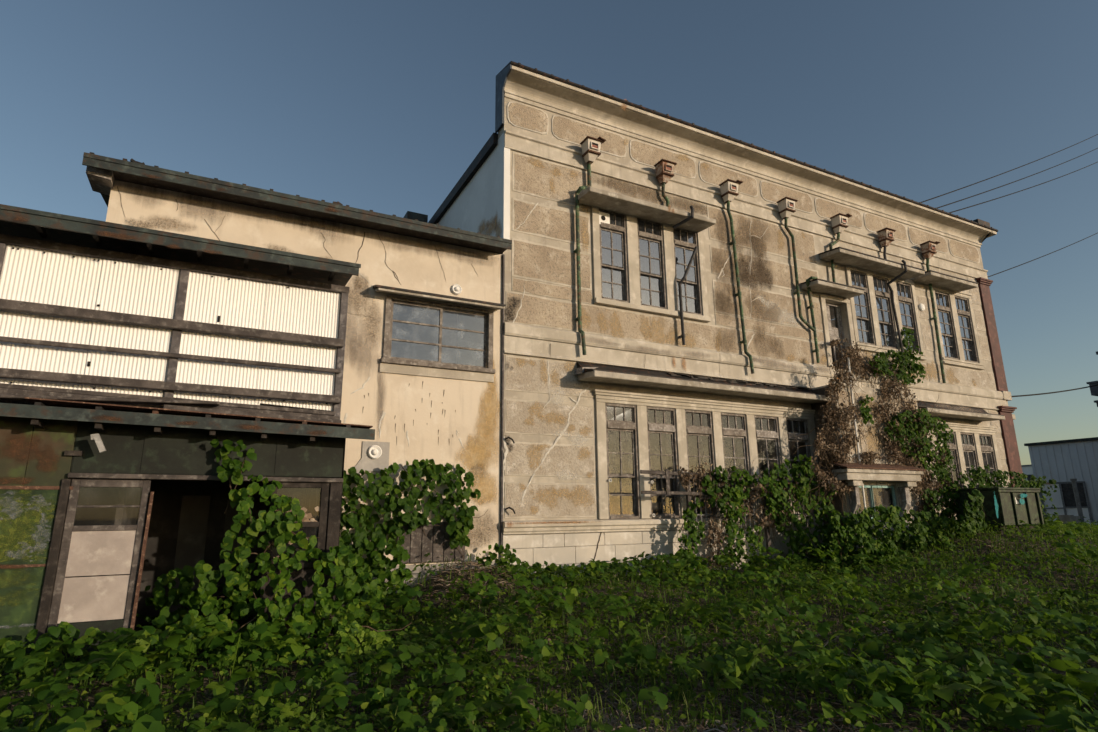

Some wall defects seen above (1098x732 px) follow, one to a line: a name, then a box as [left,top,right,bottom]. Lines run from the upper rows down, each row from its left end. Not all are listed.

crack [321,232,400,286]
water stain [714,220,800,355]
corrosion [25,397,373,434]
water stain [461,382,512,504]
crack [503,344,590,512]